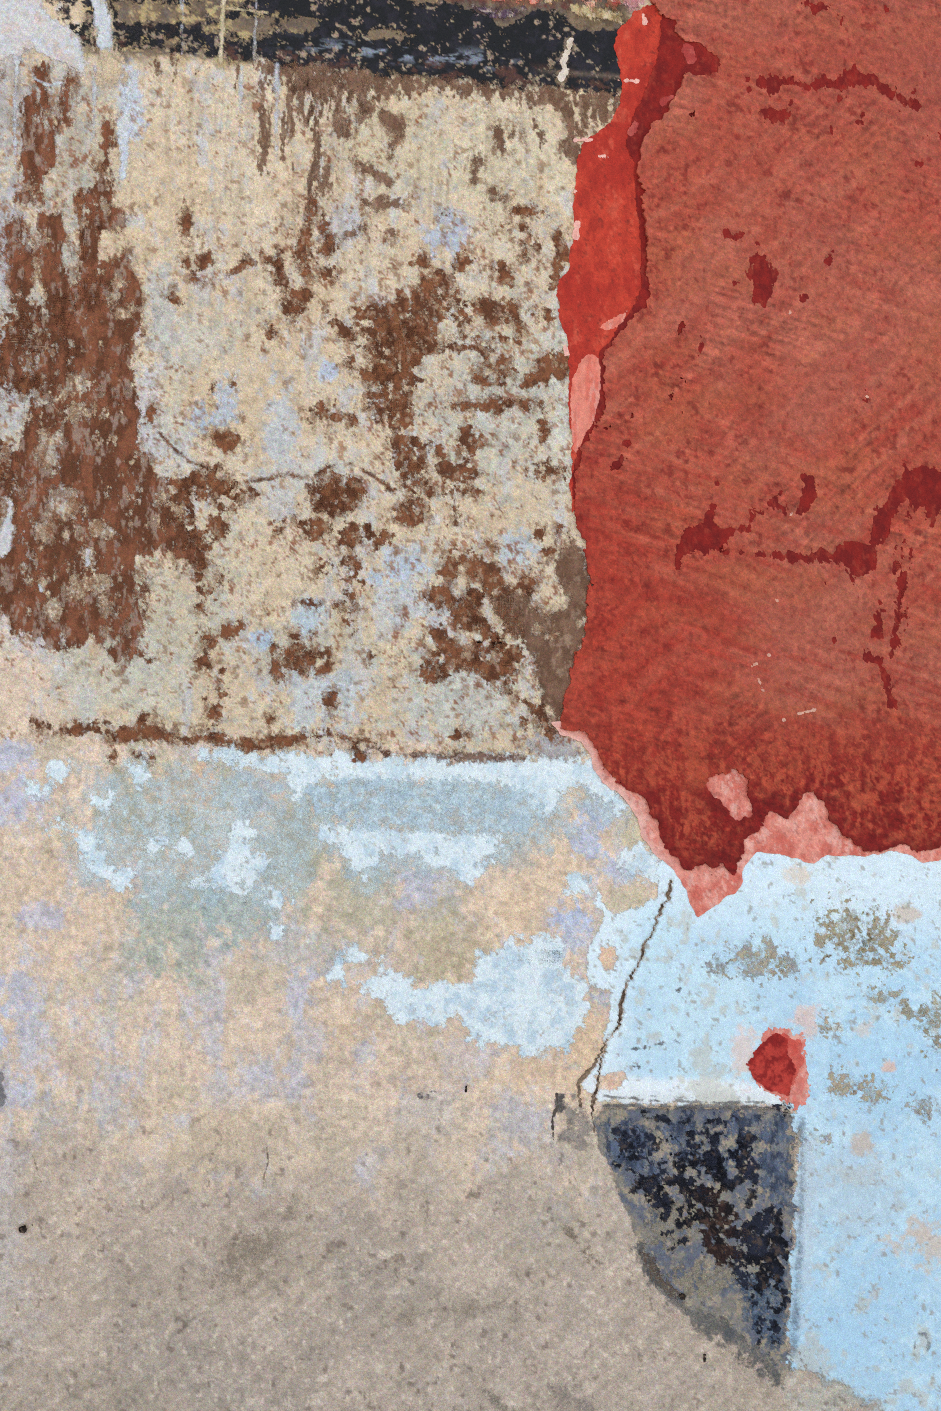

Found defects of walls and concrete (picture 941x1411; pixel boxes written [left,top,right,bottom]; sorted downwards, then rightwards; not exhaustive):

peeling [801,0,845,26]
peeling [745,63,922,124]
peeling [472,0,721,512]
peeling [721,228,779,308]
corrosion [0,61,592,766]
peeling [675,460,941,710]
peeling [616,841,660,889]
peeling [706,768,753,821]
crack [551,880,672,1140]
peeling [702,889,941,1071]
spalling [593,1011,933,1389]